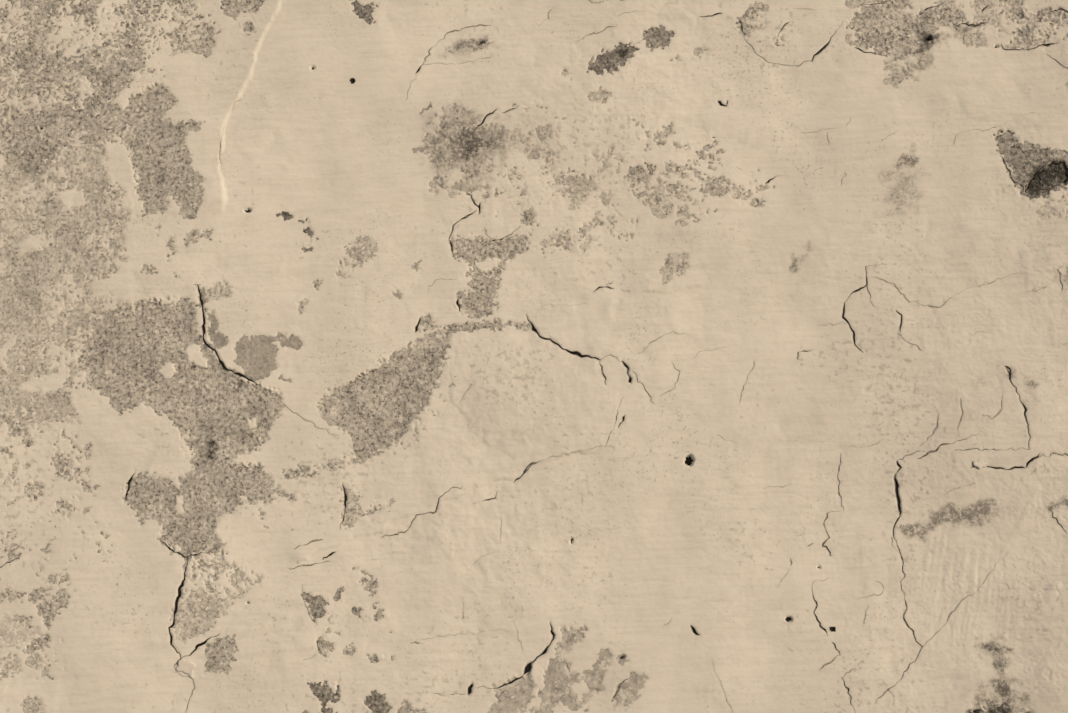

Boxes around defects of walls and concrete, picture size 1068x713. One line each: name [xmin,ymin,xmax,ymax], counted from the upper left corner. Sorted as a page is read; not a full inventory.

peeling [844,0,1068,88]
crack [919,0,1007,26]
crack [1001,43,1068,68]
crack [954,112,1068,195]
crack [195,284,258,385]
crack [817,265,1063,351]
crack [476,283,705,562]
crack [384,487,460,536]
crack [777,366,1068,713]
peeling [19,696,44,713]
peeling [302,680,341,713]
peeling [364,690,427,713]